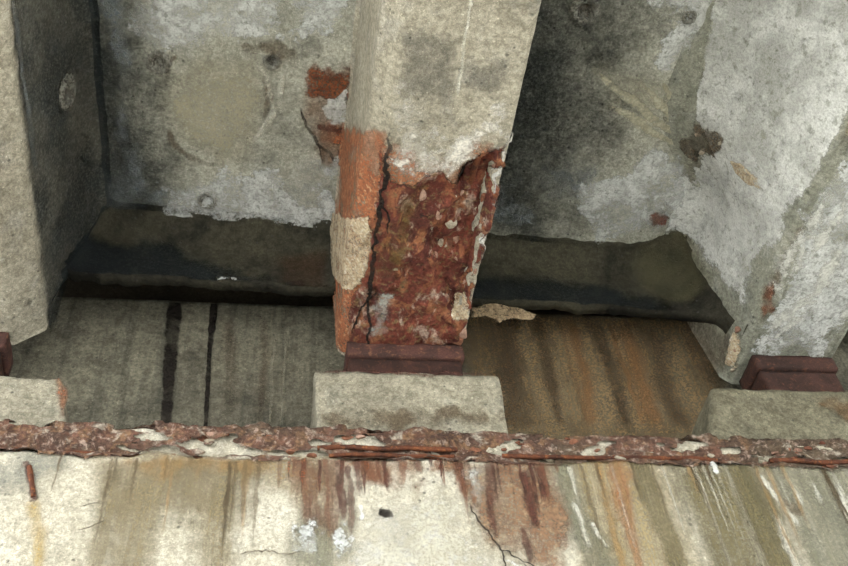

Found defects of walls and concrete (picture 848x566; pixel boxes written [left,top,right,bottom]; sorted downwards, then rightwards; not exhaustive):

crack [300,110,335,165]
crack [351,133,393,344]
rust [305,64,493,353]
spalling [330,145,536,346]
leakage [392,0,848,357]
rust [24,461,37,513]
rust [287,458,392,557]
rust [399,459,569,566]
crack [470,507,534,566]
leakage [556,460,687,566]
leakage [674,464,848,566]